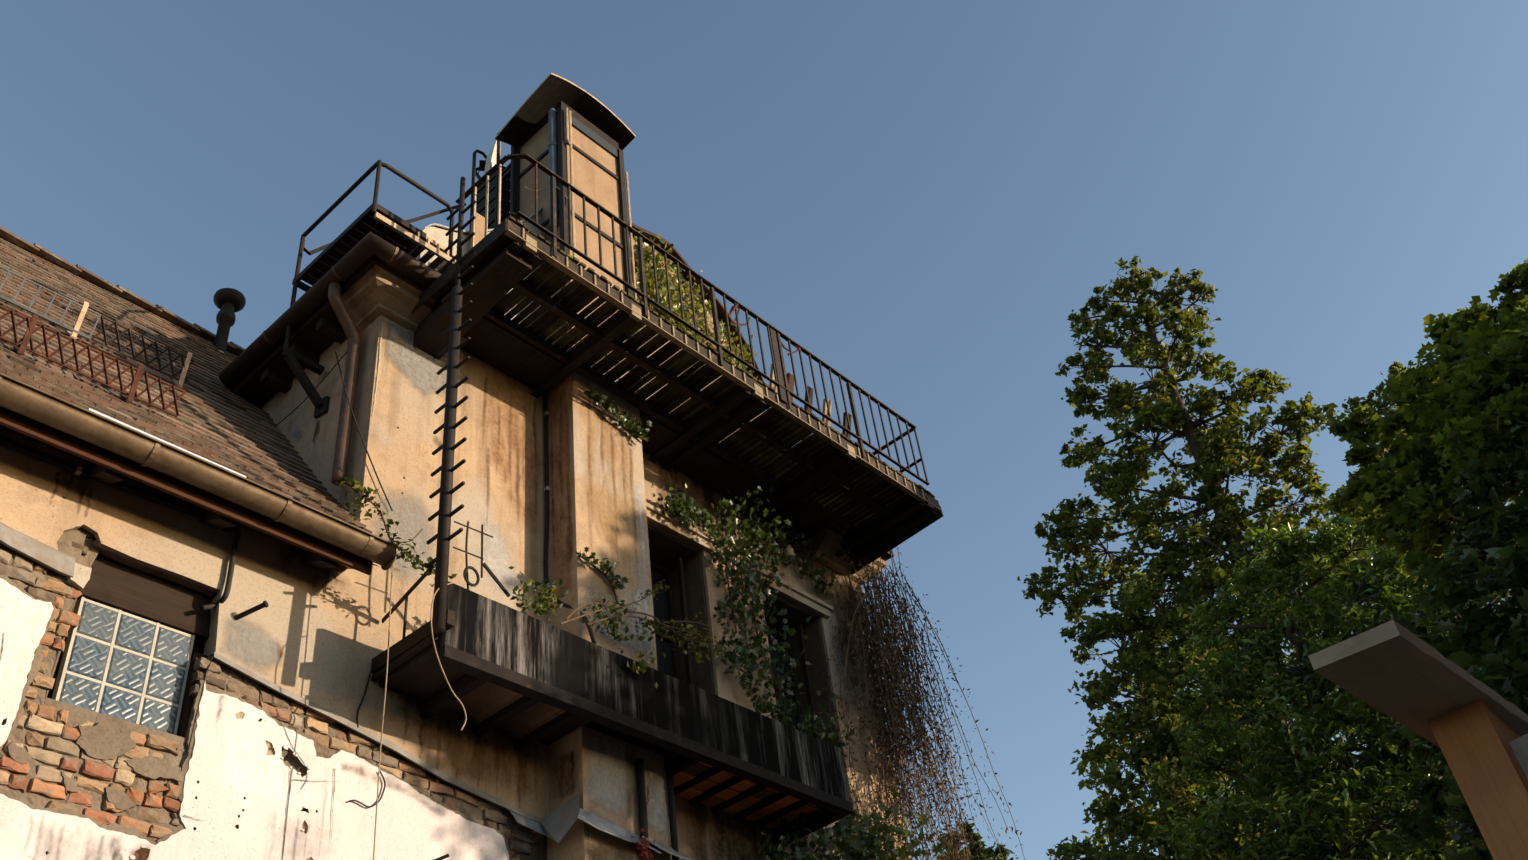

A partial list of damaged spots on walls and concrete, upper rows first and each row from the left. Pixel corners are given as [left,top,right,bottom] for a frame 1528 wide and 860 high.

flaking render [0,545,200,860]
flaking render [189,657,543,860]